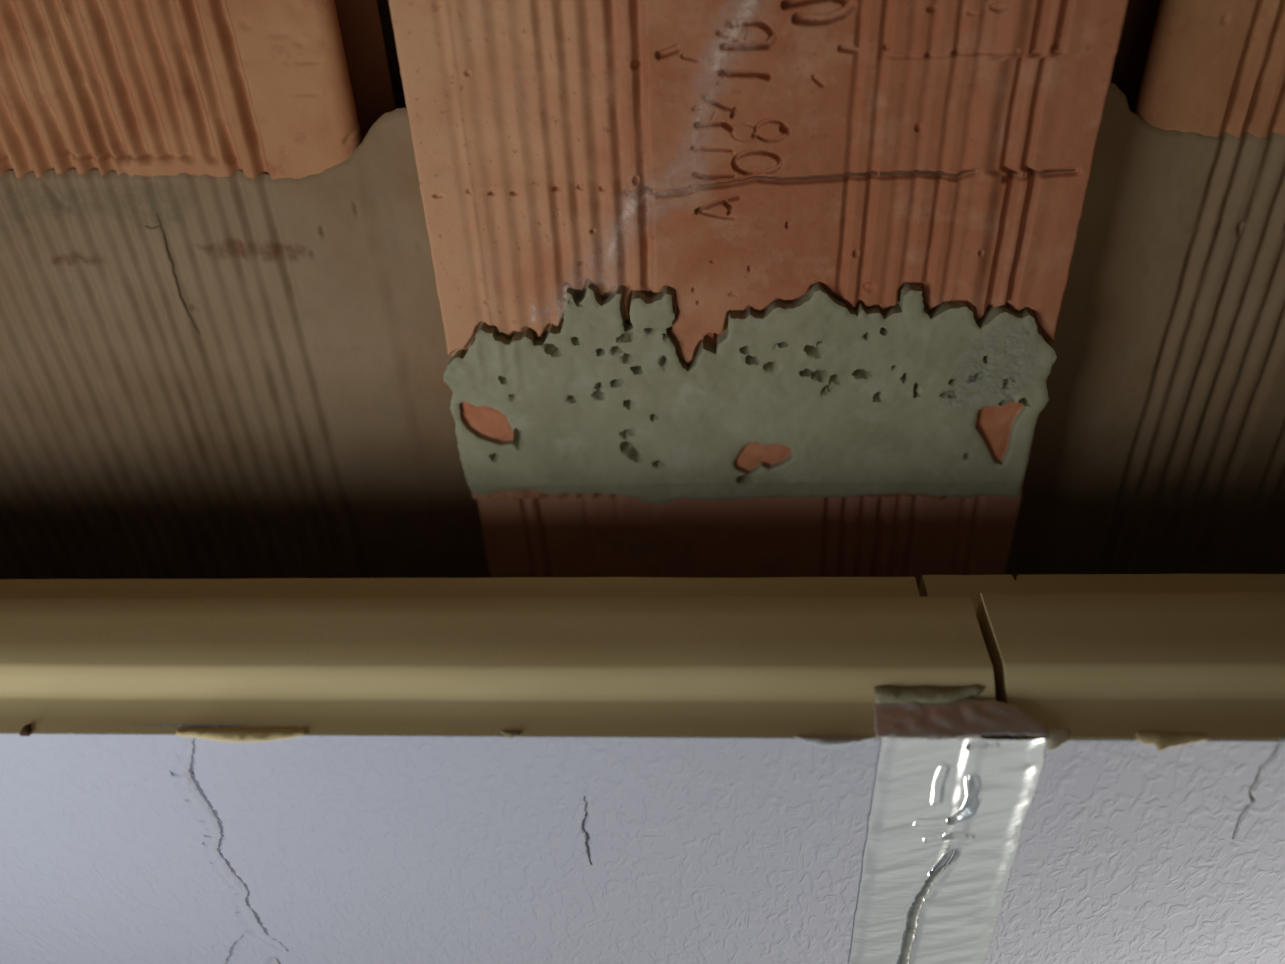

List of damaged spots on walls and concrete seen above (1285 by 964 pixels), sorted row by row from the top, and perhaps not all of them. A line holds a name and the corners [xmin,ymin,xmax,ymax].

water stain [696,0,758,127]
water stain [592,162,697,263]
spalling [460,401,513,441]
spalling [734,442,792,471]
spalling [975,402,1024,461]
crack [1232,735,1285,839]
crack [166,737,288,964]